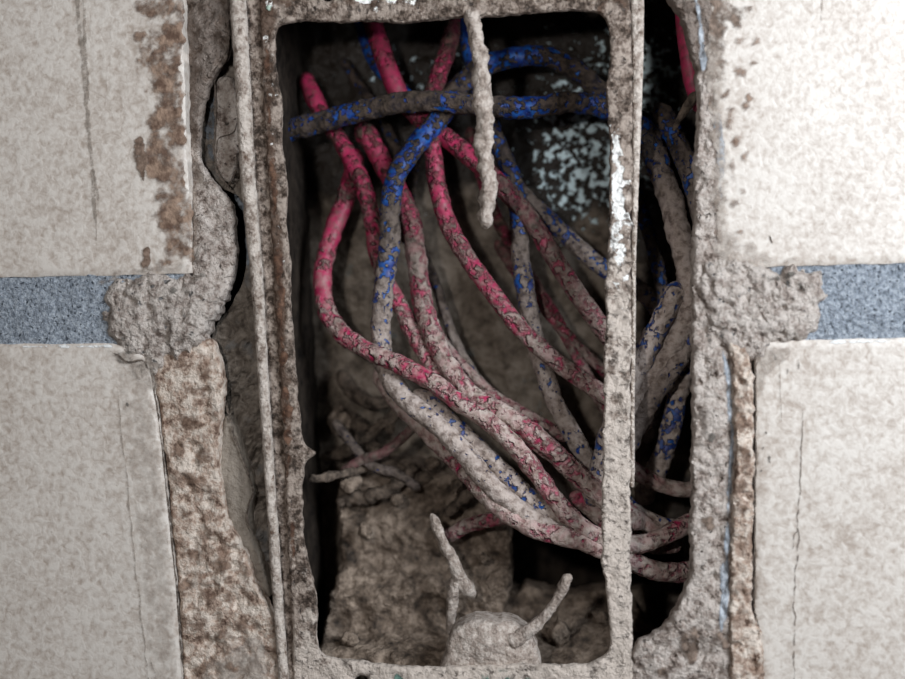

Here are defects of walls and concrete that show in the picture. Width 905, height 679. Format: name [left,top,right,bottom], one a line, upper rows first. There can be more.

spalling [133,0,195,270]
flaking render [214,75,240,184]
crack [112,352,185,679]
peeling [181,416,201,429]
peeling [215,557,231,573]
flaking render [221,414,272,596]
spalling [739,448,751,492]
crack [753,356,803,679]